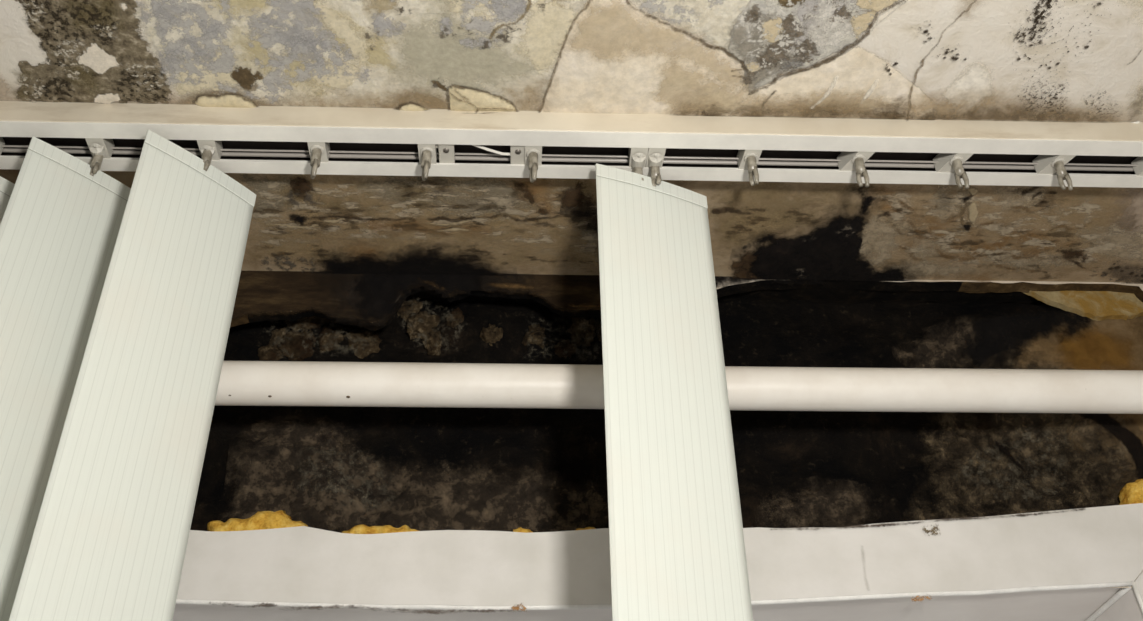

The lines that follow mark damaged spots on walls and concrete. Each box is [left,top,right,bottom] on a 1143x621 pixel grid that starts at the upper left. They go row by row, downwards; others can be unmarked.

crack [539,2,589,113]
crack [627,0,906,105]
damp [884,0,1116,121]
flaking render [223,286,603,365]
damp [232,175,601,324]
flaking render [716,191,1143,370]
flaking render [190,395,609,533]
flaking render [730,410,1143,528]